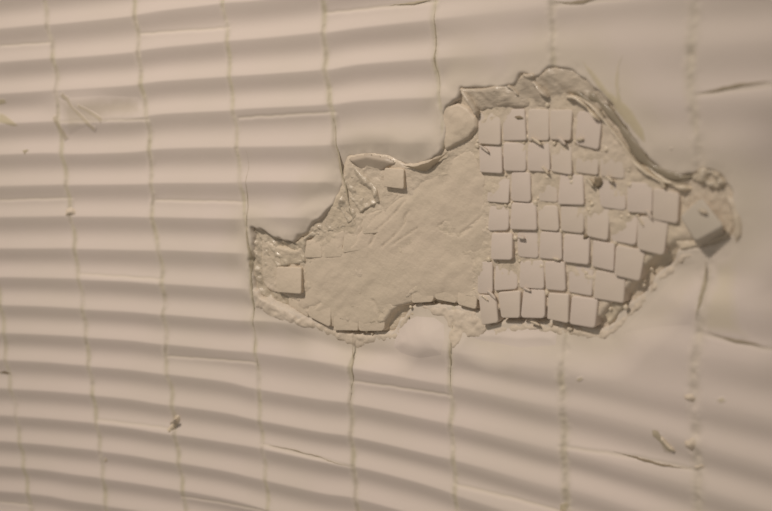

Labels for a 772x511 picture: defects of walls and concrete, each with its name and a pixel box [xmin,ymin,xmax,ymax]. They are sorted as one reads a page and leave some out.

crack [696,81,772,94]
spalling [253,67,742,348]
crack [270,445,347,466]
crack [613,451,691,469]